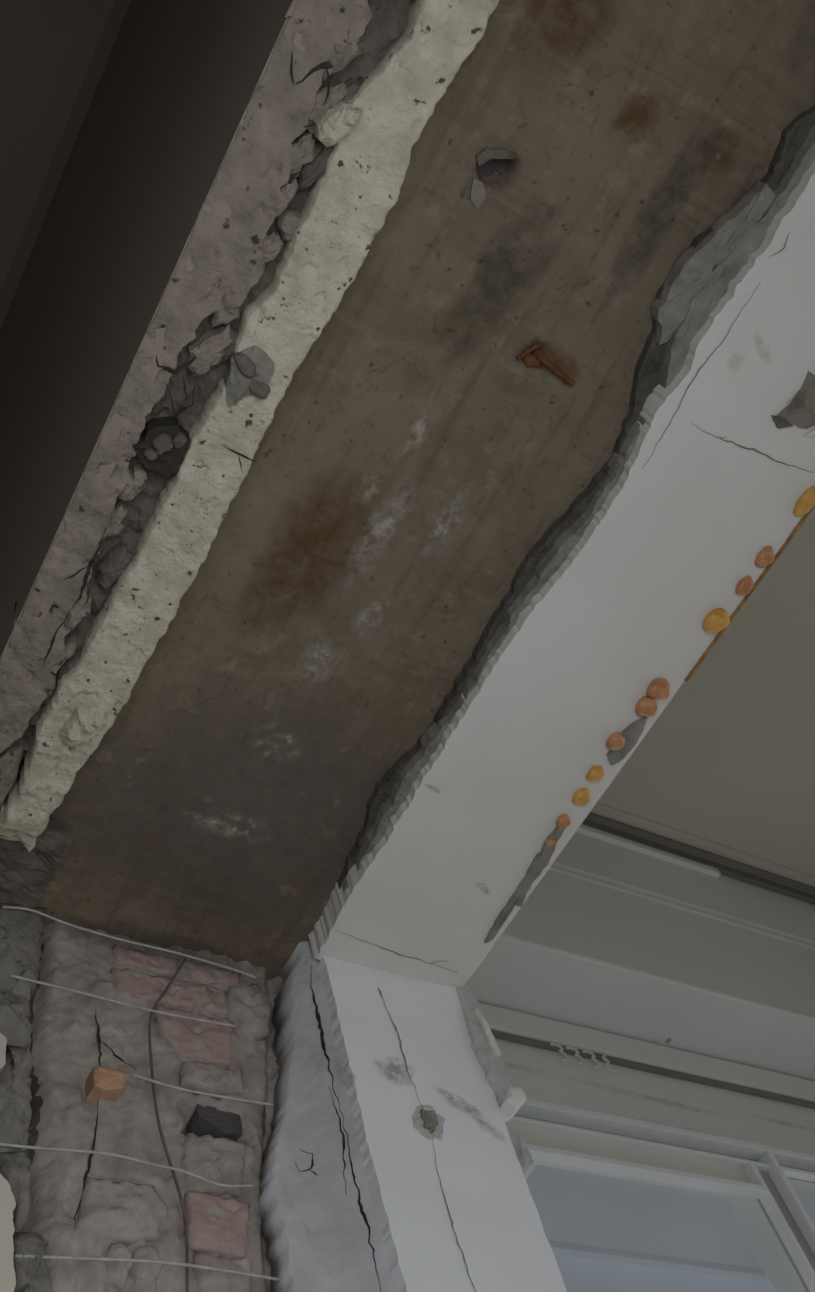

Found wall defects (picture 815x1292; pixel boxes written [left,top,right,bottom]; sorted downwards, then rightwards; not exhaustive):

crack [11,454,169,752]
flaking render [133,416,191,477]
crack [224,445,259,471]
spalling [224,345,275,407]
crack [145,0,413,432]
corrosion [516,342,575,387]
flaking render [337,104,815,892]
crack [643,234,809,472]
flaking render [0,740,73,1292]
flaking render [75,944,272,1292]
crack [378,987,476,1292]
flaking render [484,826,565,944]